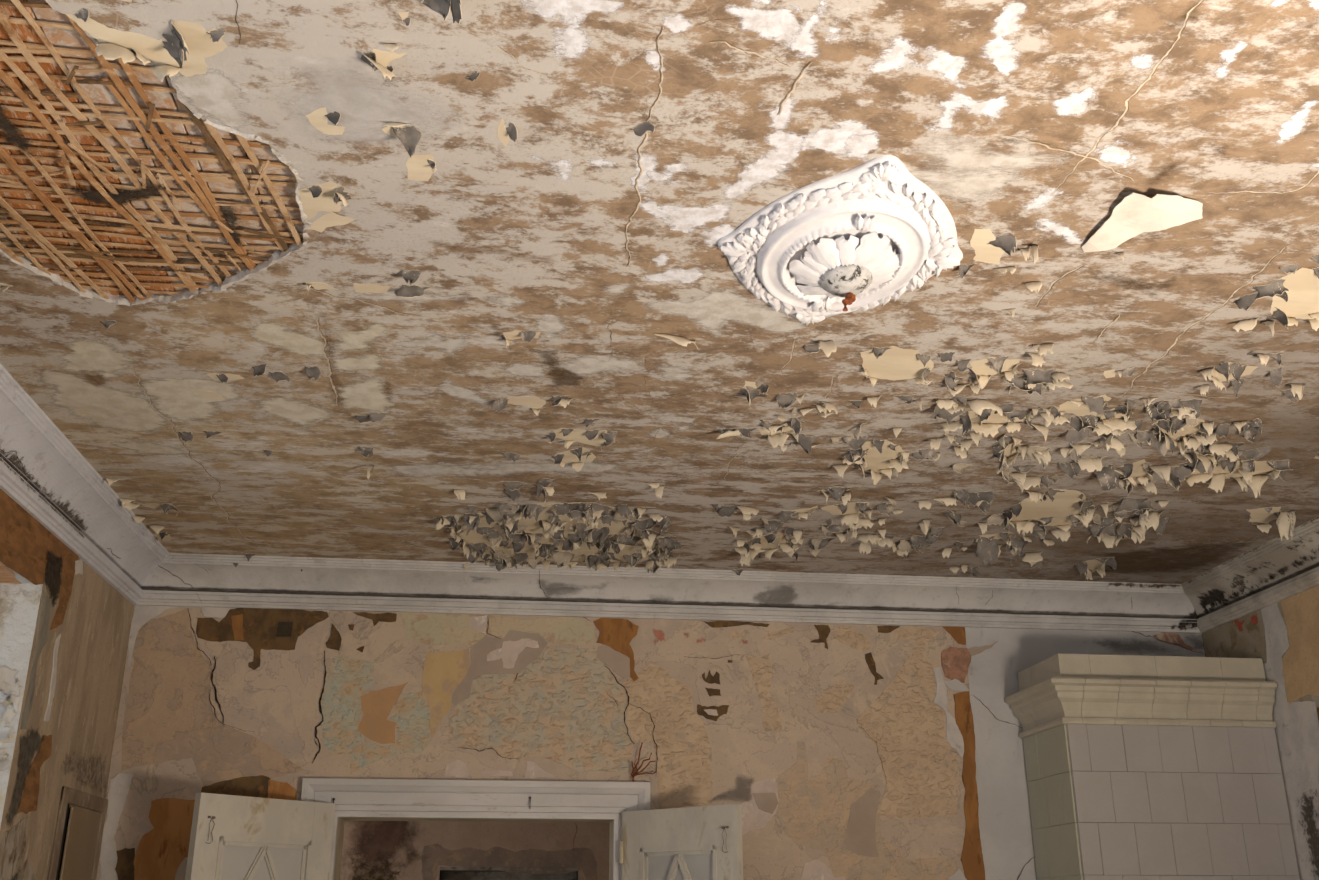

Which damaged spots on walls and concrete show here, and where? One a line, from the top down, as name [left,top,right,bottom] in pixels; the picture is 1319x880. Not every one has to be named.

peeling [66,8,227,83]
efflorescence [520,0,624,58]
damp [726,0,841,58]
damp [868,2,1068,201]
damp [631,98,879,247]
damp [646,289,807,337]
peeling [1233,256,1319,336]
peeling [433,419,682,573]
peeling [709,341,1307,581]
crack [312,651,327,763]
crack [605,666,658,773]
peeling [1153,603,1319,880]